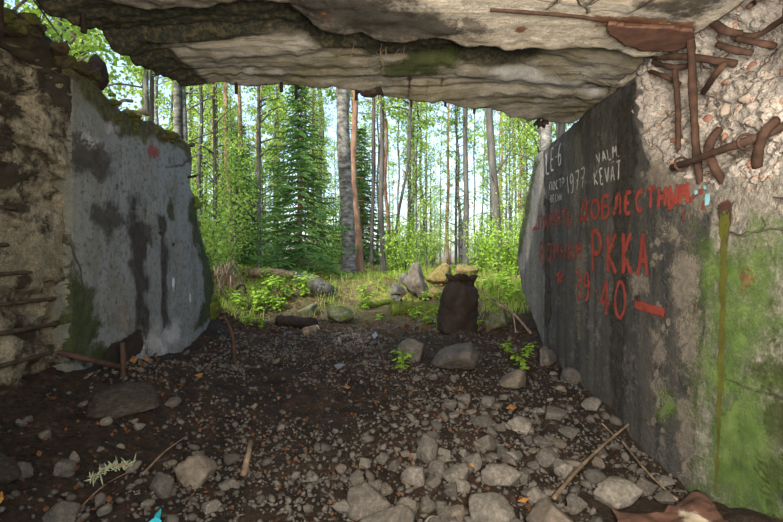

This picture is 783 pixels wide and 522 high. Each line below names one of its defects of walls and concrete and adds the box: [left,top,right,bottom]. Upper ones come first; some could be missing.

spalling [79,11,87,34]
crack [540,0,668,18]
rust [594,15,696,29]
spalling [87,54,109,91]
spalling [632,0,783,227]
spalling [0,0,71,396]
damp [91,197,178,353]